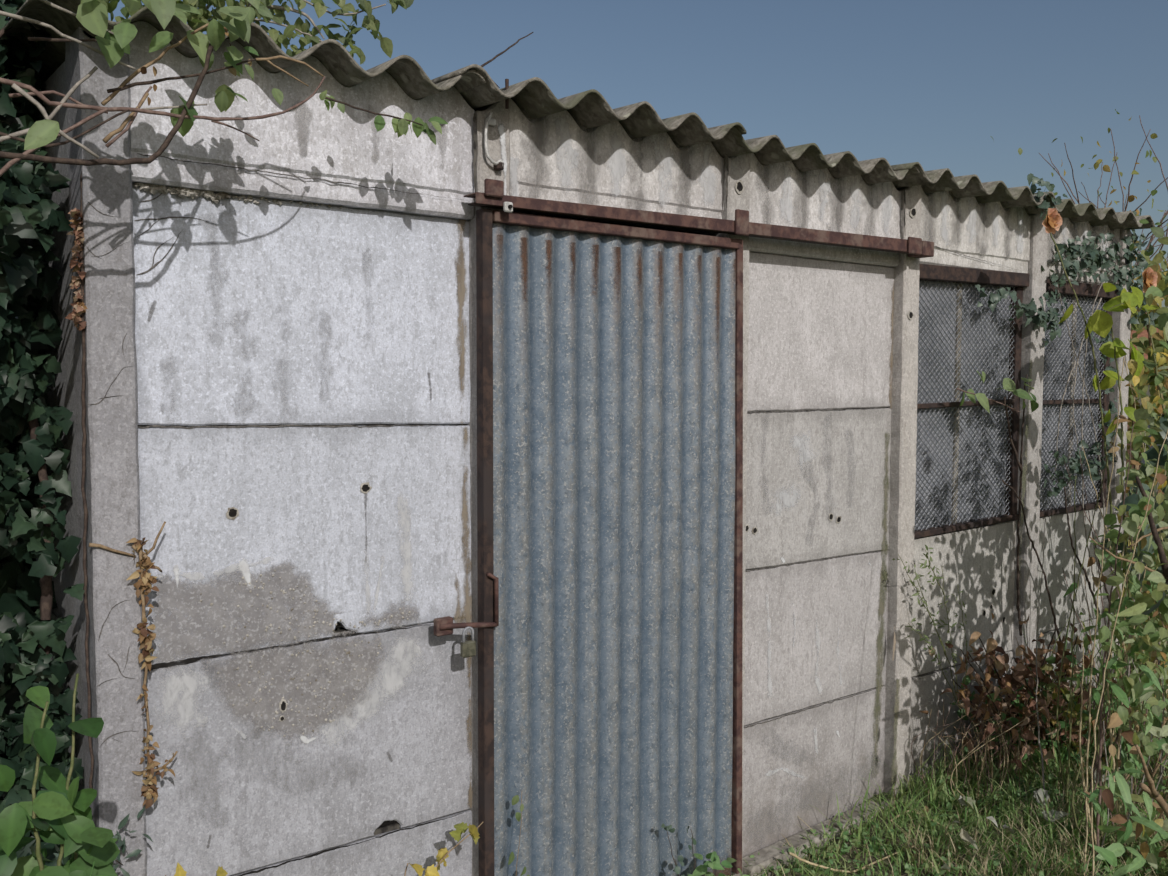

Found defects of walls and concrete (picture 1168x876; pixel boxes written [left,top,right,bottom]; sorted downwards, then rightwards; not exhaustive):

rust [455,219,466,390]
rust [454,471,472,640]
leakage [163,672,209,727]
crack [98,599,433,686]
peeling [150,557,418,744]
leakage [318,640,421,743]
crack [239,813,462,876]